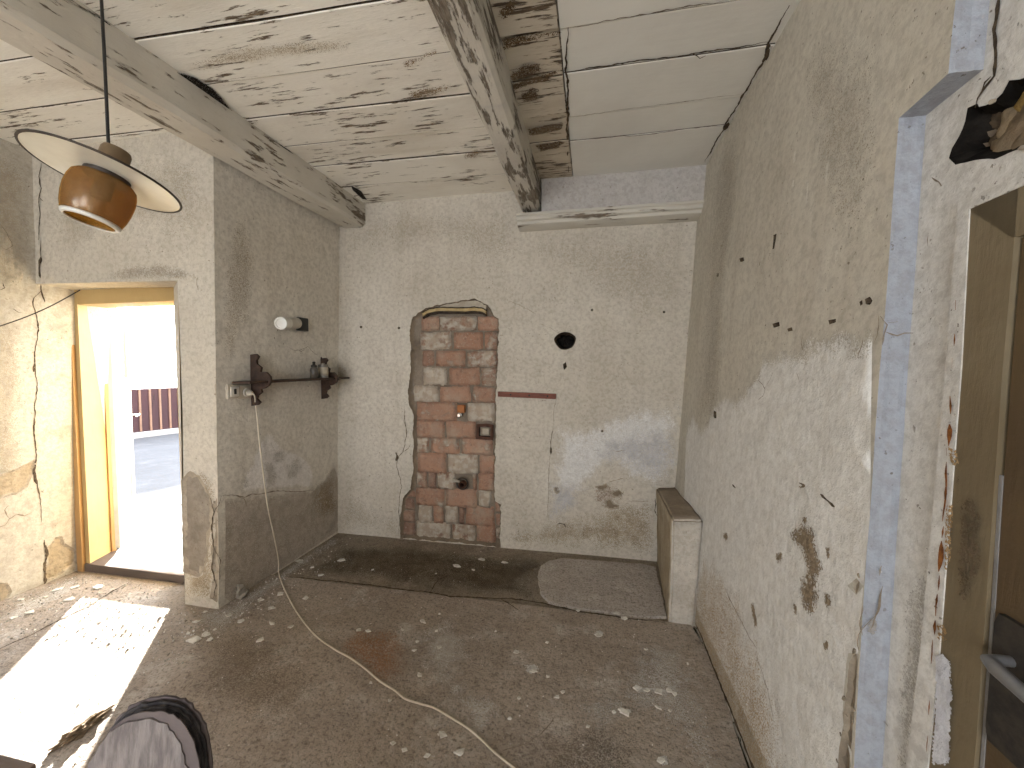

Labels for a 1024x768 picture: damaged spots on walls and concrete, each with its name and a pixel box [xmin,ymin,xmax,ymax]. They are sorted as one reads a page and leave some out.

crack [564,1,790,172]
spalling [949,78,1024,165]
crack [975,0,1000,108]
crack [0,168,49,584]
spalling [0,459,37,499]
spalling [46,536,77,581]
spalling [180,471,218,602]
crack [211,490,309,598]
leakage [185,466,544,732]
leakage [509,140,872,768]
rust [931,398,959,662]